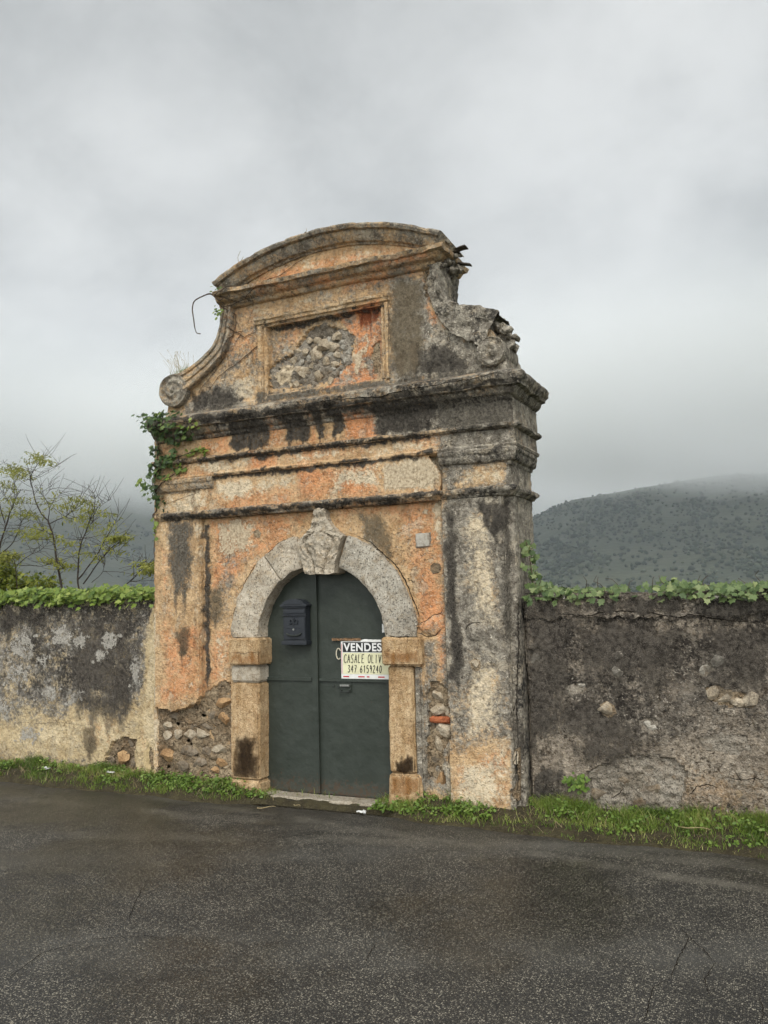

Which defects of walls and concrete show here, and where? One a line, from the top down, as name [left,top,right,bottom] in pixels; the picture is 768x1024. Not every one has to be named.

spalling [424,238,464,297]
flaking render [270,322,381,389]
water stain [154,280,514,480]
water stain [163,489,443,686]
water stain [444,511,466,692]
water stain [84,727,97,757]
water stain [69,618,132,715]
flaking render [107,681,232,781]
water stain [233,738,257,778]
water stain [396,756,415,774]
flaking render [426,681,451,784]
crack [510,603,766,789]